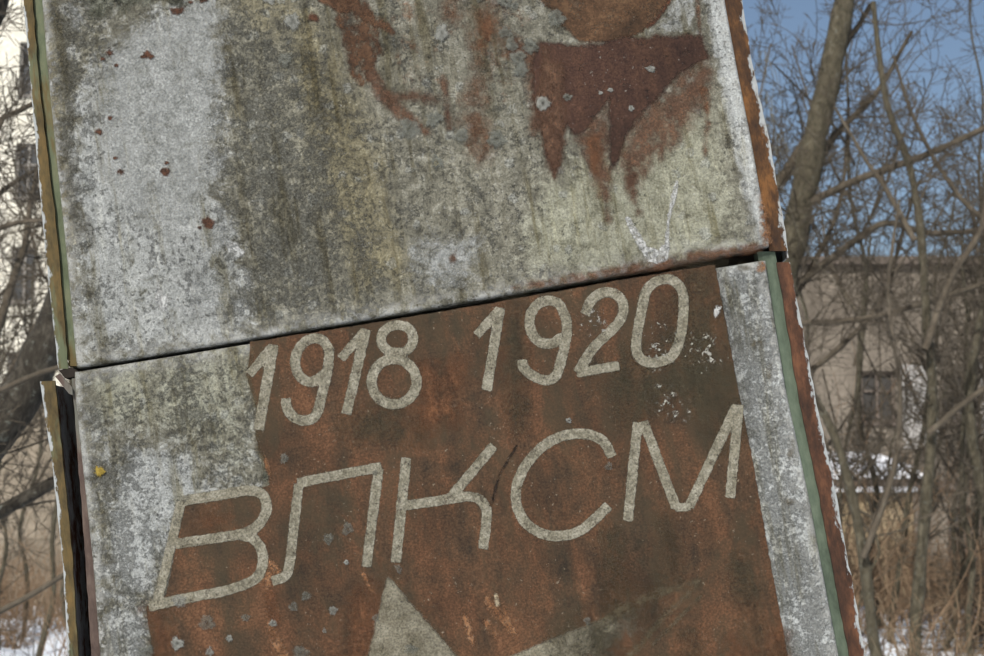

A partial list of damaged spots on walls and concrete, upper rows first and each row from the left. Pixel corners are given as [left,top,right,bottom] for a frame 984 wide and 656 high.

rust [198,216,215,229]
rust [687,195,772,262]
peeling [648,322,729,373]